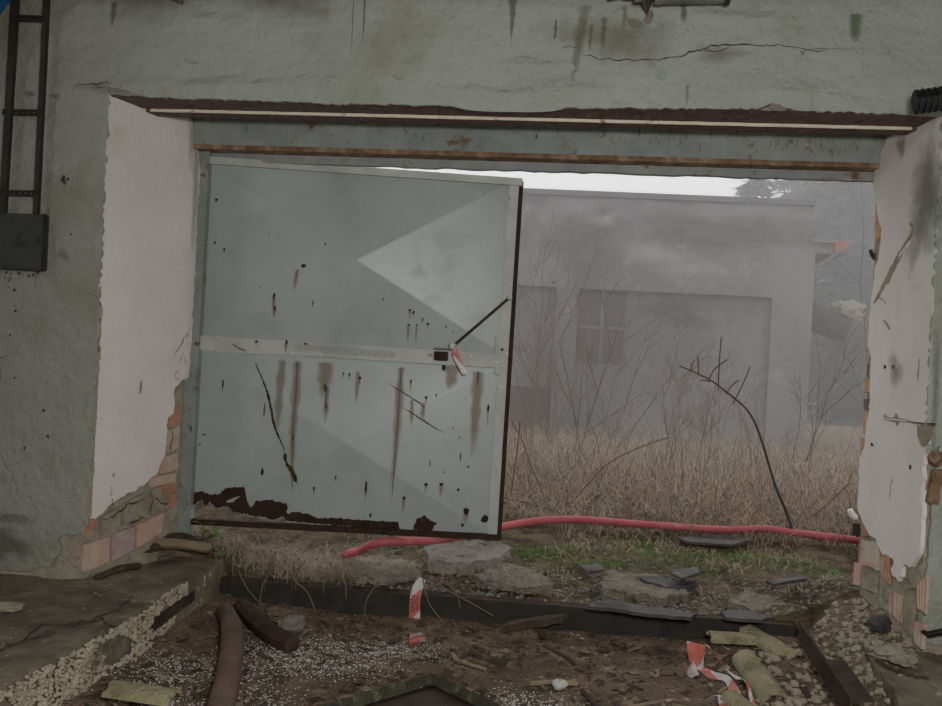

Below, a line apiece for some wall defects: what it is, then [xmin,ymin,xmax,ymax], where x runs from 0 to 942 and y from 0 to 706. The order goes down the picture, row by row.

crack [564,43,852,61]
flaking render [81,286,182,572]
flaking render [861,363,873,449]
crack [0,596,132,651]
flaking render [760,526,930,668]